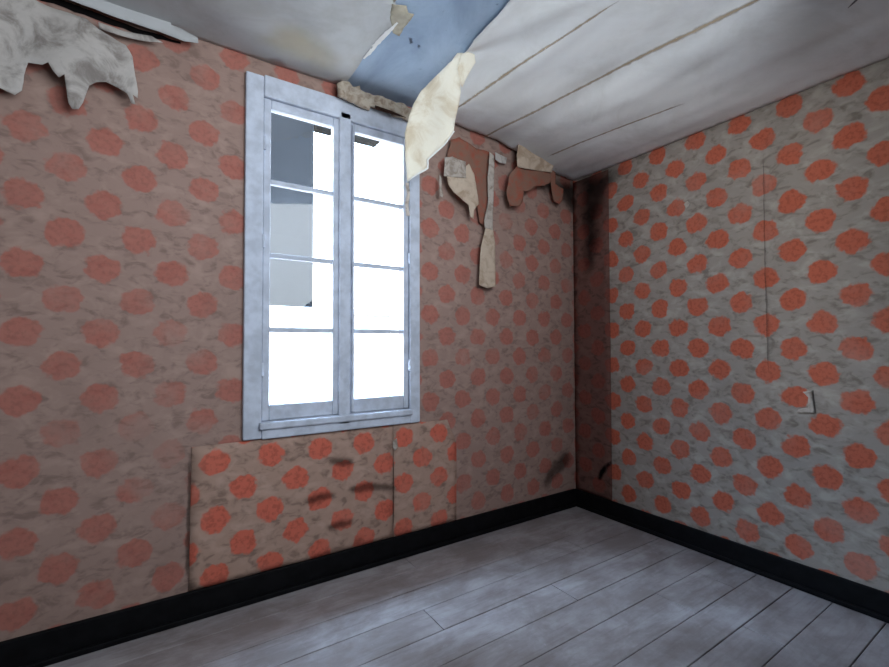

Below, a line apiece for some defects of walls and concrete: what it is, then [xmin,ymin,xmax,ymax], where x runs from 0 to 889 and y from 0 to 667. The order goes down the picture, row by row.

spalling [390,0,414,36]
peeling [336,52,475,216]